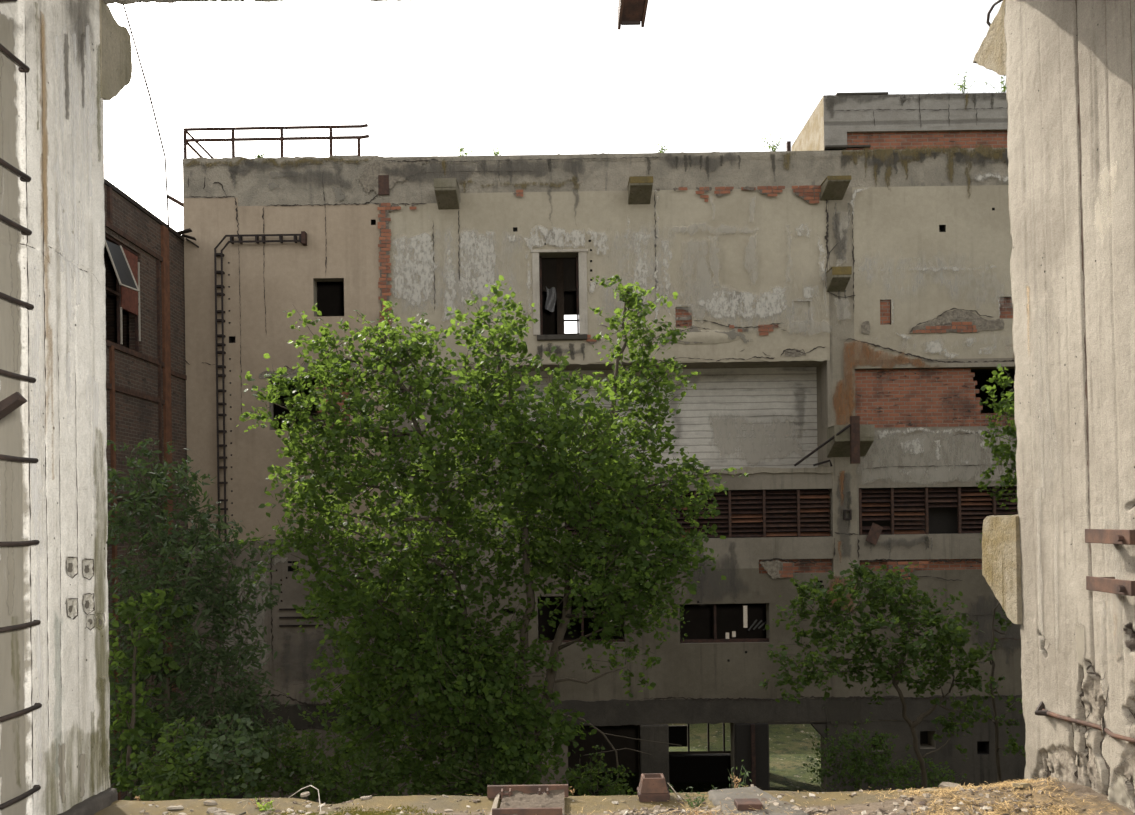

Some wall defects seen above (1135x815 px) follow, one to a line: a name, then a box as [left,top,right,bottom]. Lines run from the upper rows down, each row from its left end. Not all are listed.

spalling [655,185,821,203]
leakage [841,144,1008,197]
peeling [359,157,496,326]
peeling [508,226,609,313]
peeling [624,189,863,346]
spalling [892,294,1011,358]
leakage [0,13,31,815]
corrosion [833,341,932,425]
spalling [1074,673,1106,735]
spalling [1038,696,1135,813]